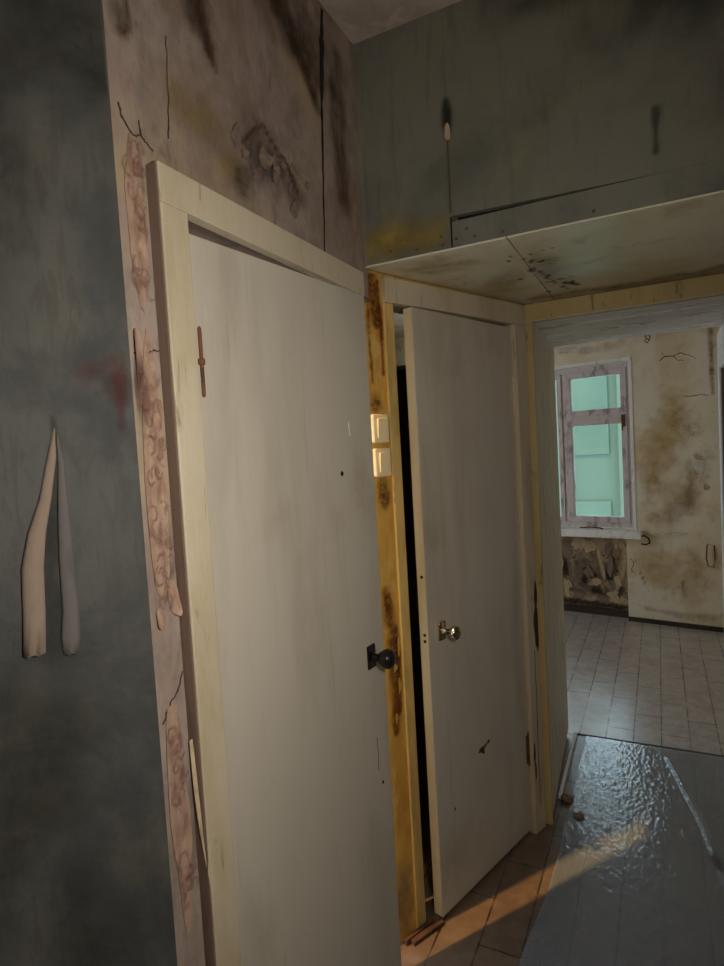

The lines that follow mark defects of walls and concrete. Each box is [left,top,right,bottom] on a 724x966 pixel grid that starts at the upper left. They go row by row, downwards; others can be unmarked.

water stain [270,0,343,127]
crack [318,7,326,252]
peeling [156,580,183,631]
flaking render [561,538,628,606]